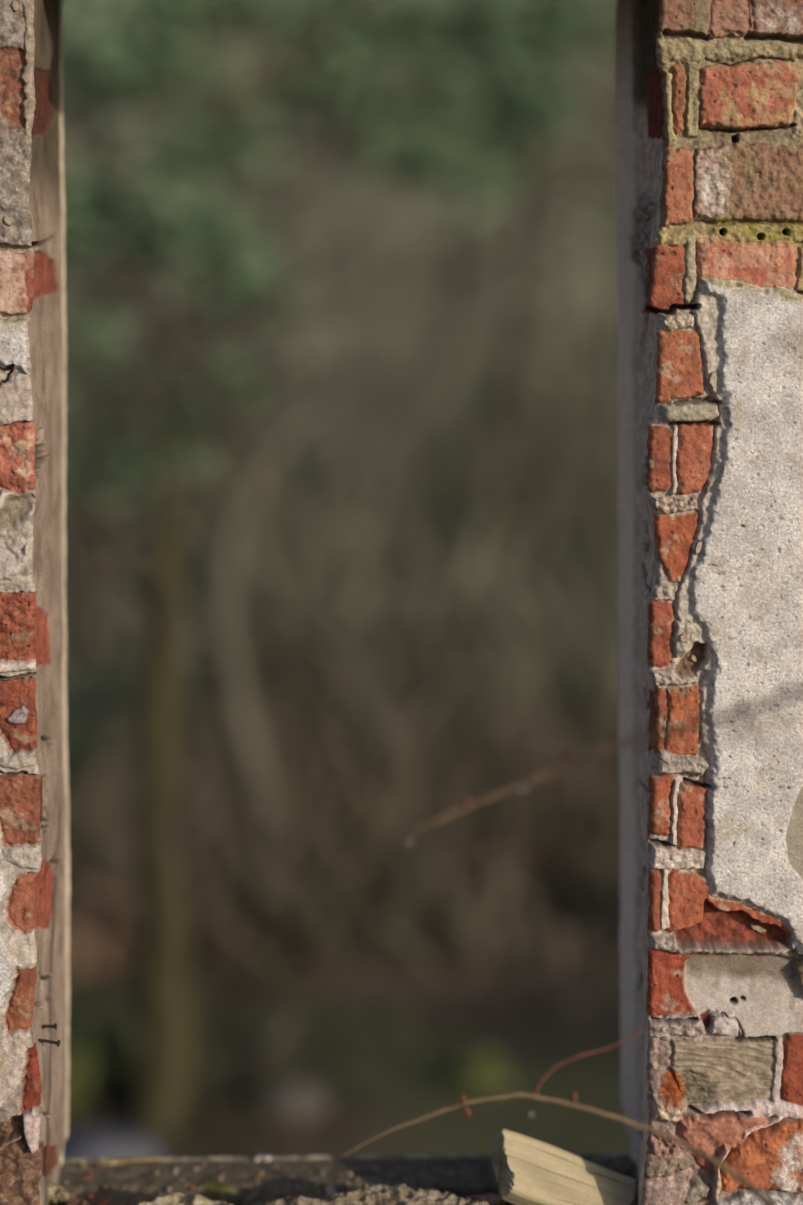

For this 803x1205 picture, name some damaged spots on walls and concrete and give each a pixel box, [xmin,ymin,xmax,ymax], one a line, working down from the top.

crack [0,365,14,385]
spalling [34,429,46,479]
spalling [0,489,37,594]
spalling [673,278,803,1037]
spalling [0,732,40,775]
spalling [0,823,43,1205]